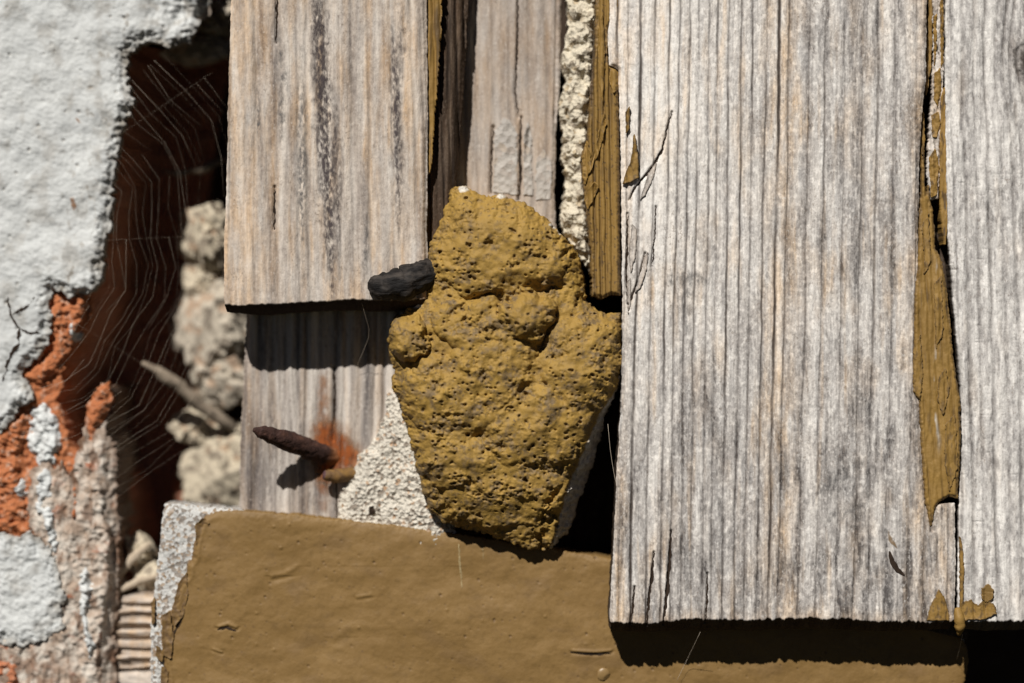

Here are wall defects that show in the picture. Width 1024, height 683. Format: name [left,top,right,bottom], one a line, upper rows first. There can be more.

peeling [582,15,619,209]
crack [625,113,672,304]
peeling [913,0,962,527]
flaking render [24,292,94,386]
flaking render [0,661,19,683]
flaking render [0,402,62,558]
flaking render [78,567,97,659]
flaking render [85,381,115,443]
peeling [150,572,189,683]
peeling [195,518,209,544]
rust [313,377,359,491]
peeling [927,536,997,636]